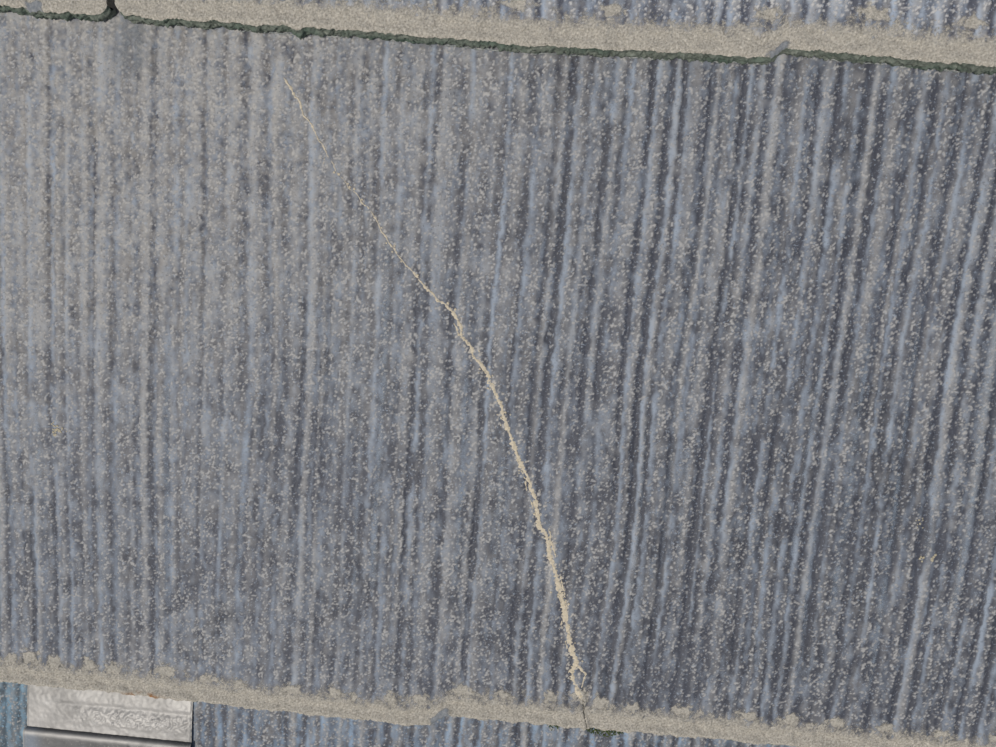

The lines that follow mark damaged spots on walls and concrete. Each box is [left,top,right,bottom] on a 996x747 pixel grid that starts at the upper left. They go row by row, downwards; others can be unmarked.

crack [283,77,587,728]